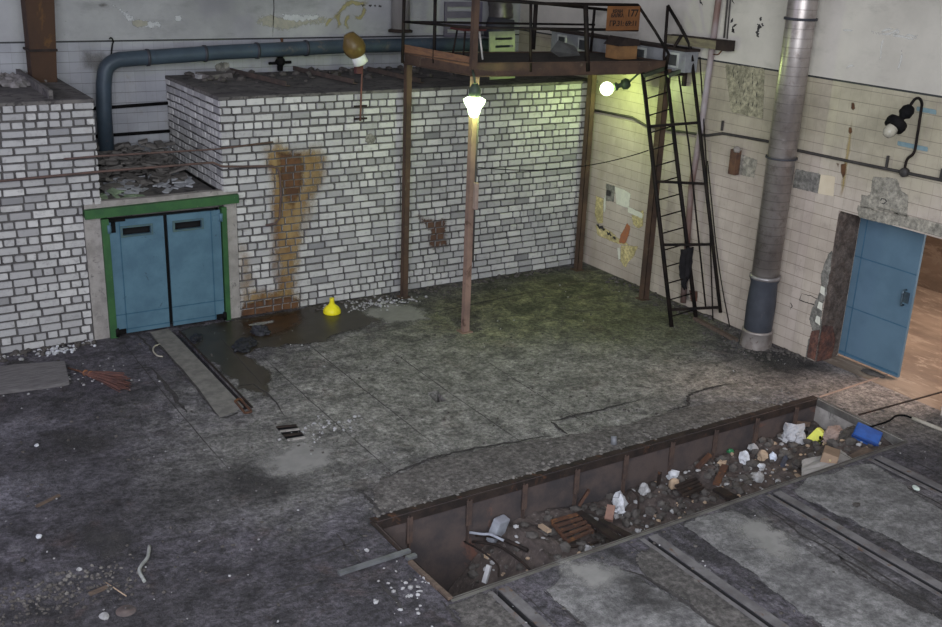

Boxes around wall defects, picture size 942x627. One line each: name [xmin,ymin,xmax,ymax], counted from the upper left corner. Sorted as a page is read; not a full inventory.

peeling [725,64,765,119]
rust [241,144,324,316]
damp [181,294,429,397]